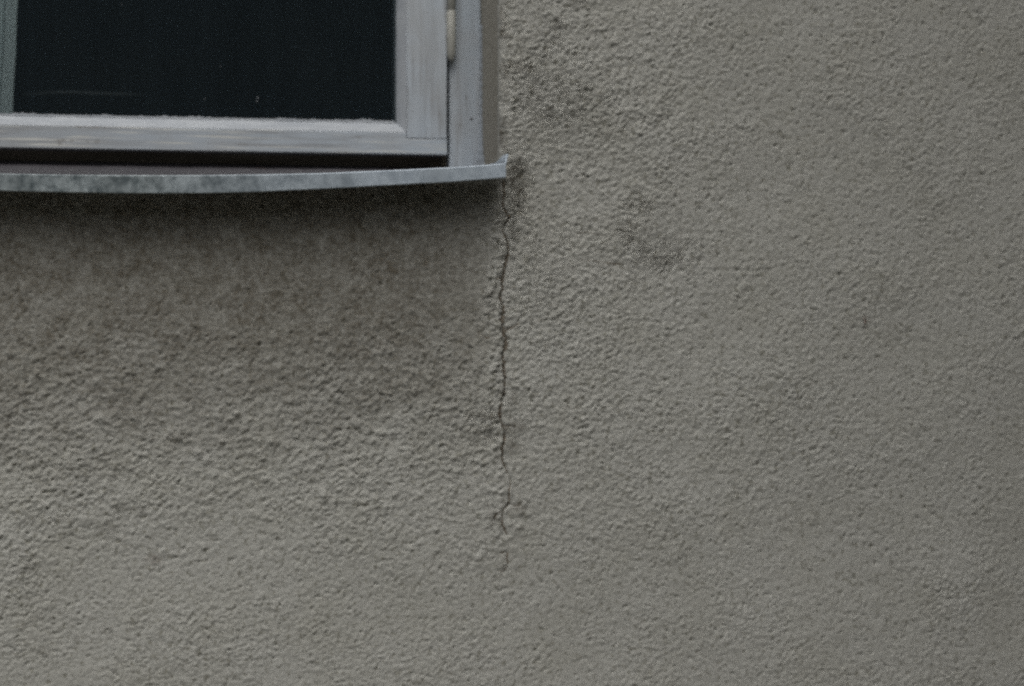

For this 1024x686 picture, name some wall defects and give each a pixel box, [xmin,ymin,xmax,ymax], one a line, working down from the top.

crack [482,180,520,572]